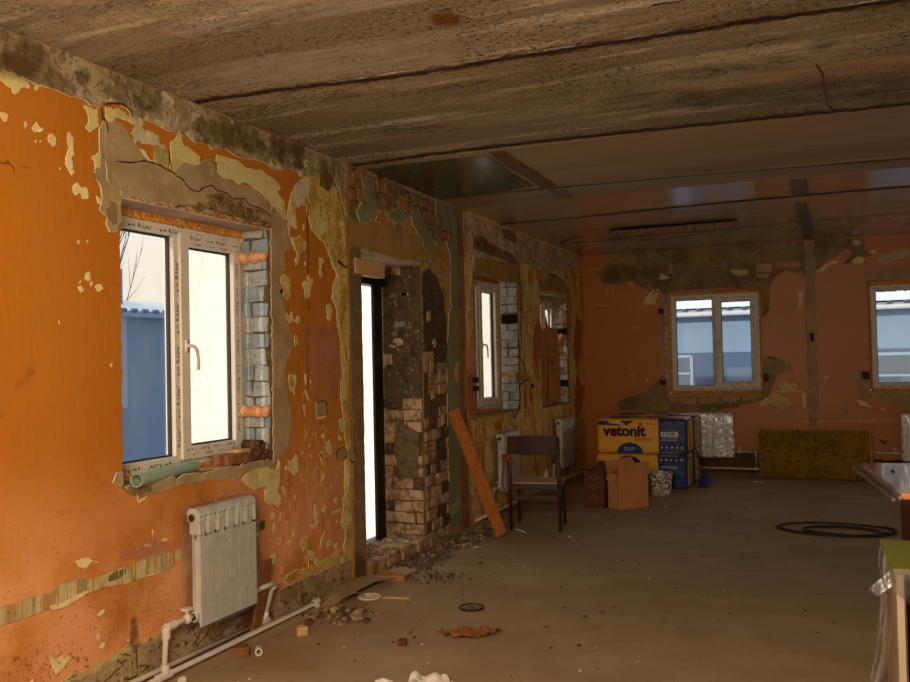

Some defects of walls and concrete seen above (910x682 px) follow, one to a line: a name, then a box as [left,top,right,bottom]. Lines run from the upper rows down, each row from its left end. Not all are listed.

crack [101,91,133,132]
crack [116,148,271,217]
flaking render [814,237,910,280]
flaking render [0,27,807,627]
flaking render [50,610,242,682]